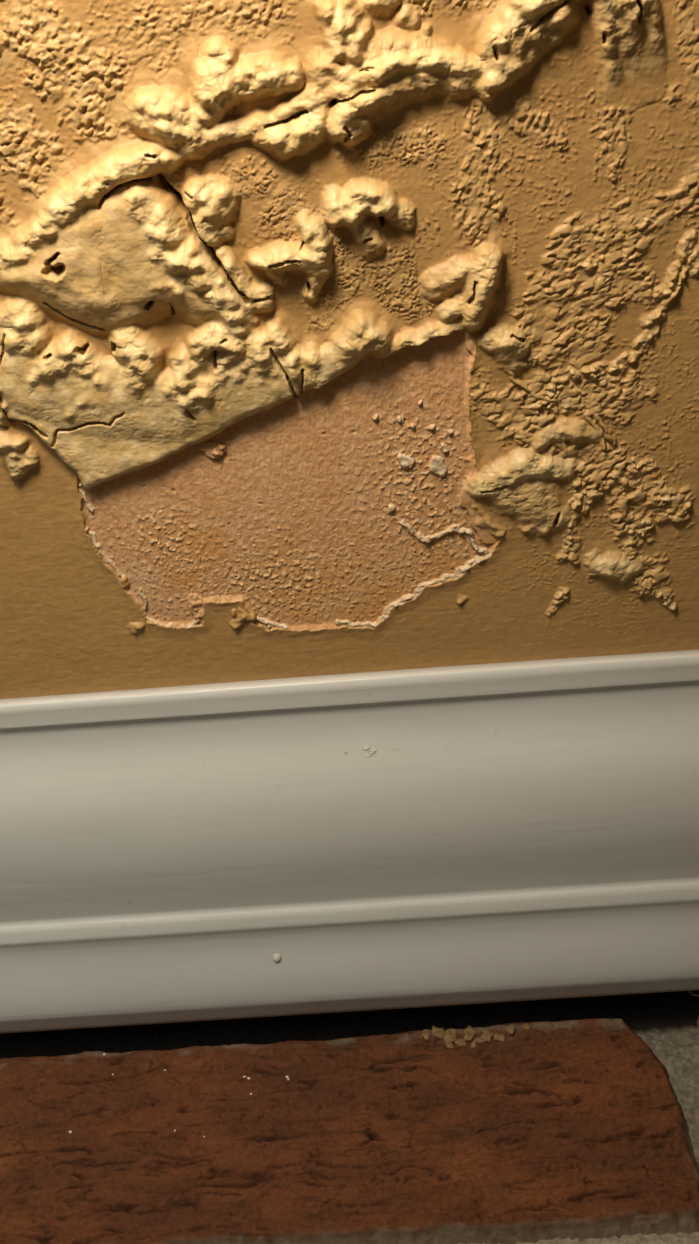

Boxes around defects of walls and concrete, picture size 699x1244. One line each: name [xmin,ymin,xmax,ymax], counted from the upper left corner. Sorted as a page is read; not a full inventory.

flaking render [0,296,603,634]